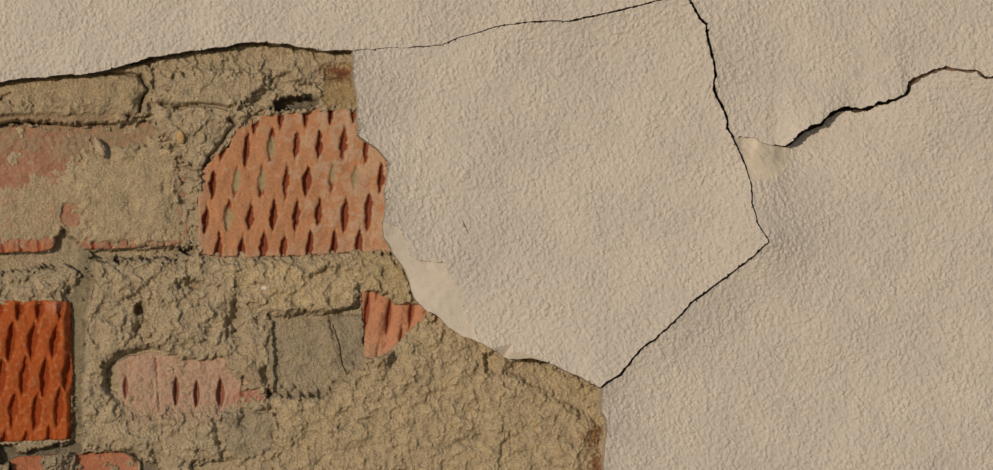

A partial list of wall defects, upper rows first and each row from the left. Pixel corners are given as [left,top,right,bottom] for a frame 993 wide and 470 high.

spalling [0,42,605,470]
crack [351,0,661,52]
crack [601,0,769,388]
crack [782,66,993,147]